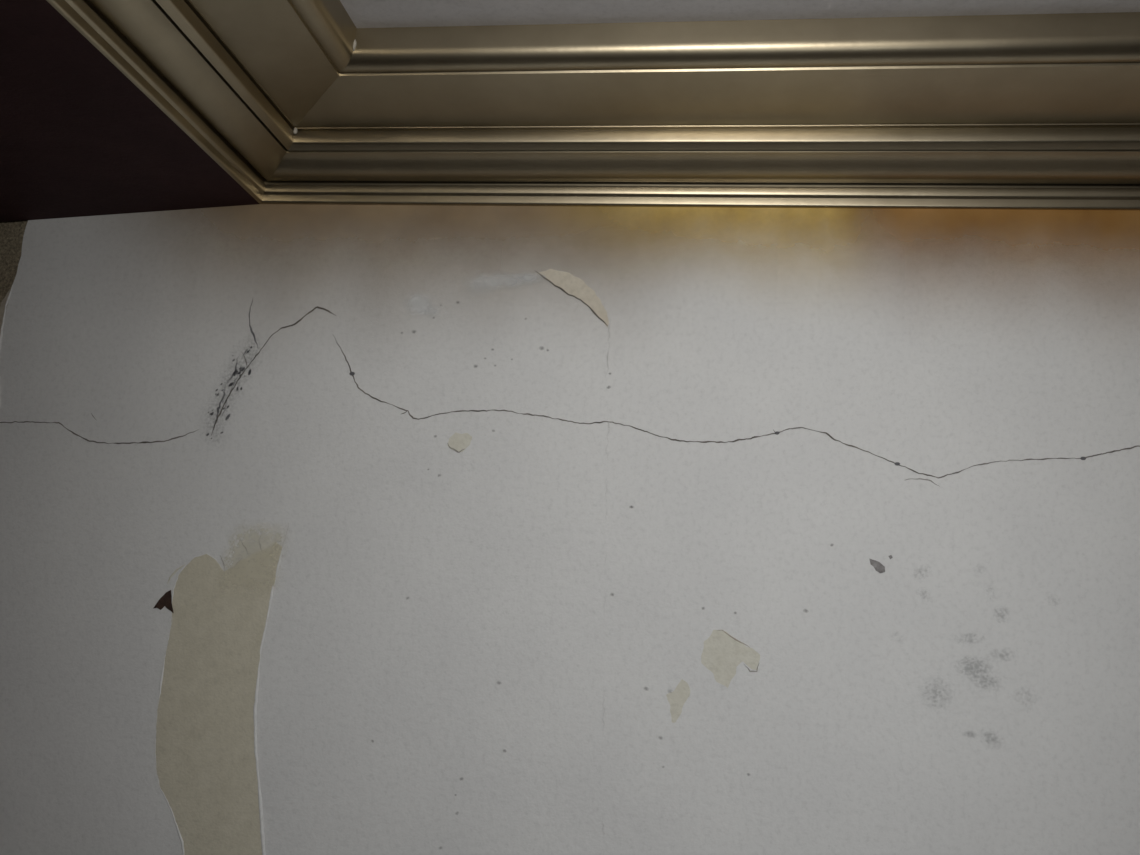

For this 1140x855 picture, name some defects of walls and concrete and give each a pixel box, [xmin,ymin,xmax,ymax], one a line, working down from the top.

peeling [536,269,609,327]
crack [0,301,333,444]
crack [338,345,1137,484]
peeling [154,542,283,855]
peeling [701,630,760,688]